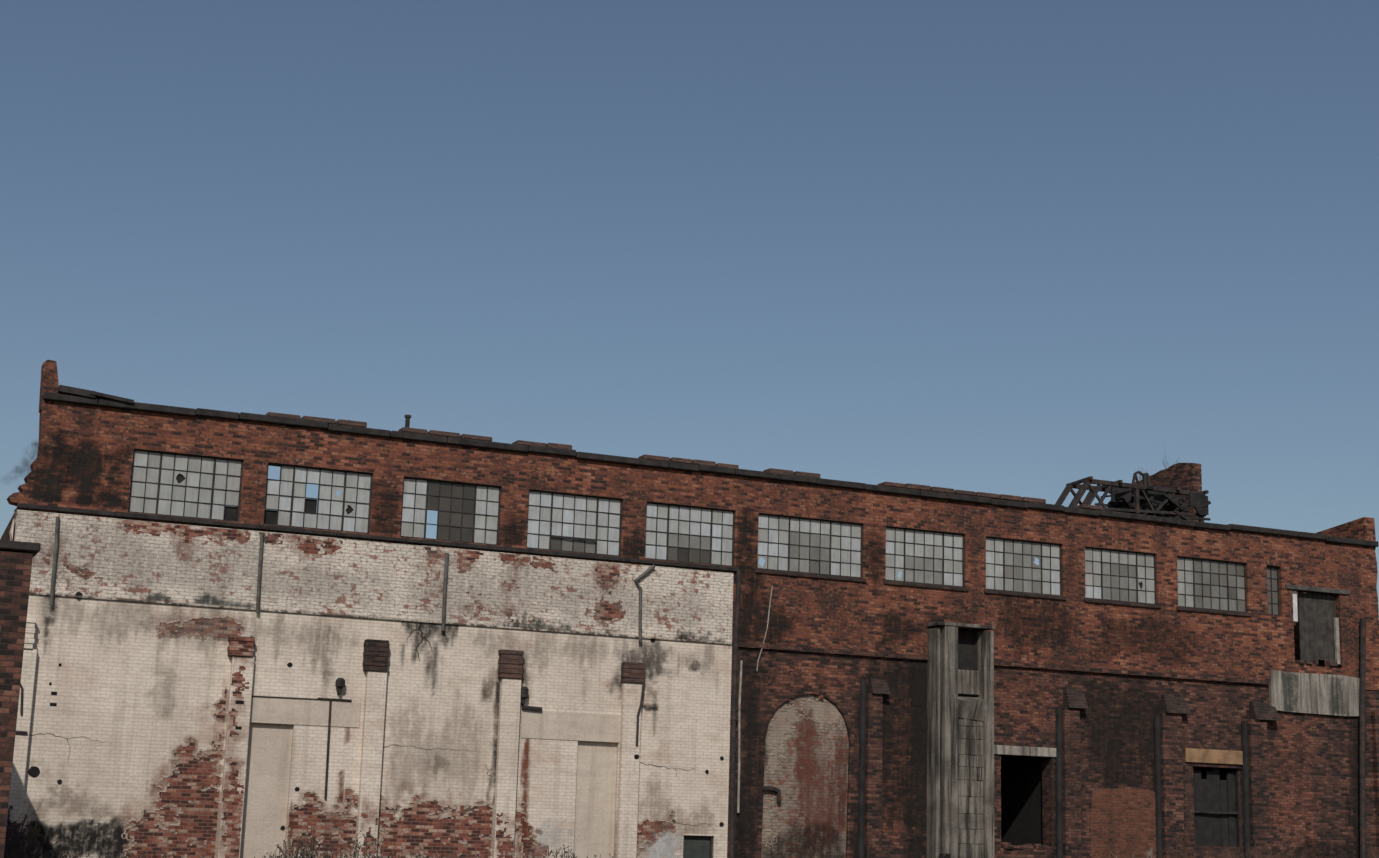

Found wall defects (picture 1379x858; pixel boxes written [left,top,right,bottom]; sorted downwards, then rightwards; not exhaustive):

flaking render [424,547,559,591]
flaking render [586,564,626,627]
flaking render [154,614,255,647]
leakage [402,621,458,668]
flaking render [764,682,845,775]
flaking render [121,666,249,858]
flaking render [280,787,549,858]
flaking render [637,808,677,857]
flaking render [762,796,785,849]